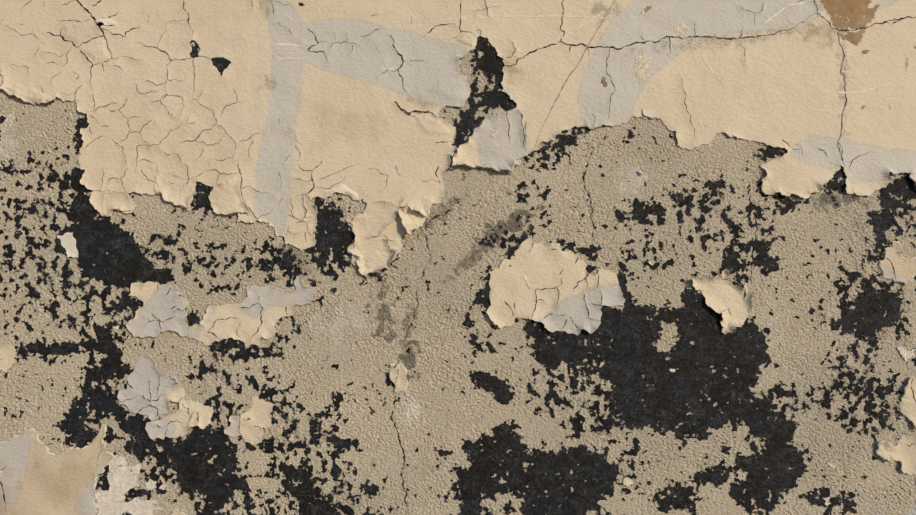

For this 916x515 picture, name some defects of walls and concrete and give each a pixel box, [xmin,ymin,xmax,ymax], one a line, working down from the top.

crack [0,0,345,239]
peeling [0,0,916,282]
crack [505,0,916,244]
peeling [0,338,33,373]
peeling [0,232,93,354]
peeling [101,275,334,459]
peeling [384,363,410,393]
peeling [465,237,625,350]
peeling [692,264,761,335]
peeling [847,198,916,302]
peeling [0,410,180,515]